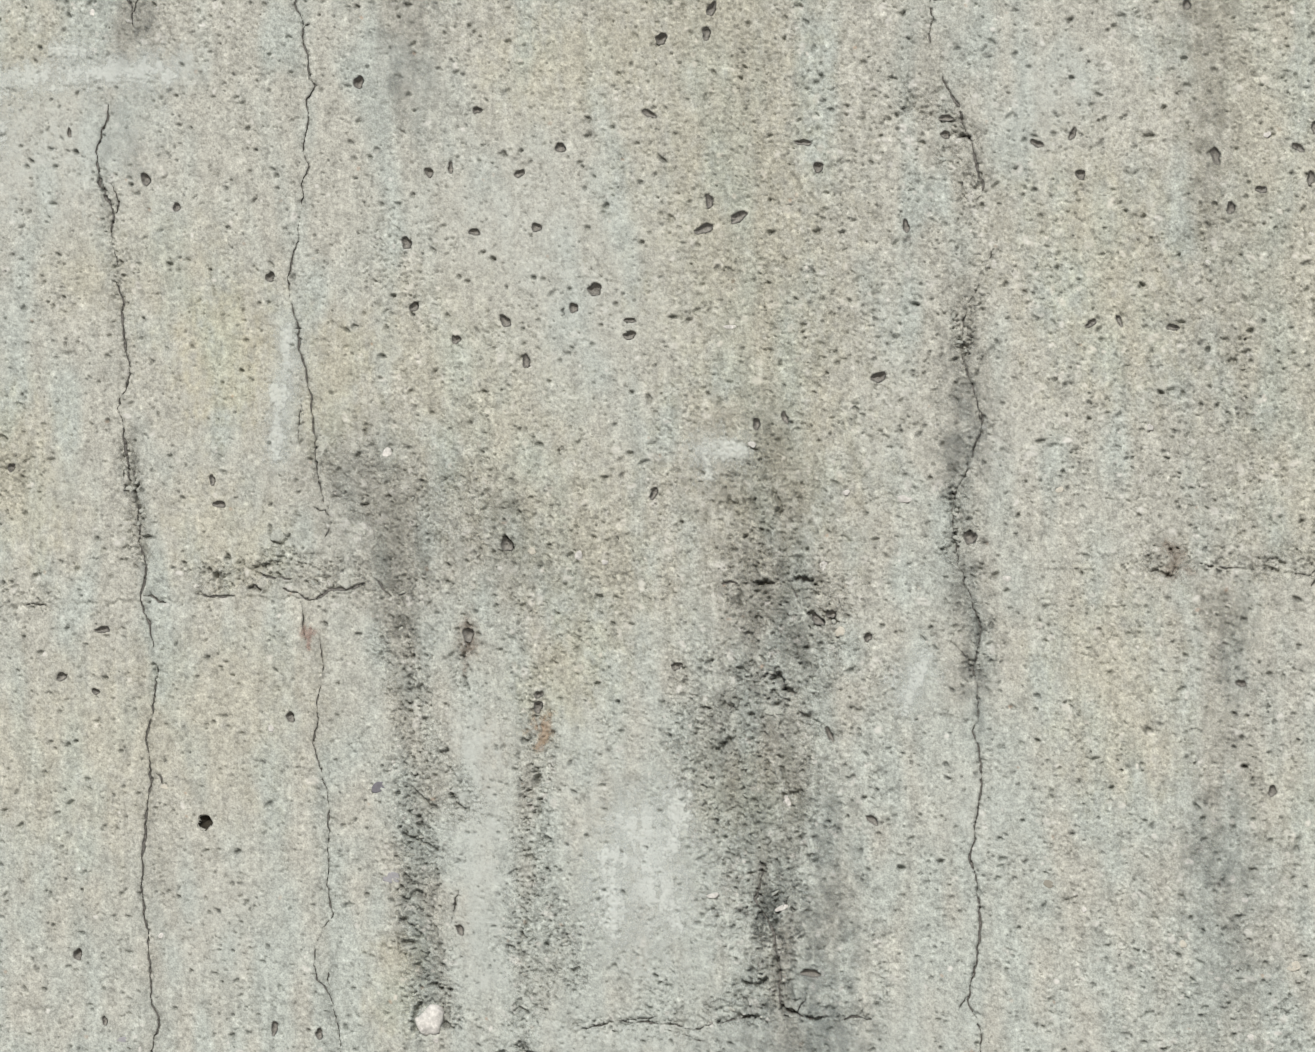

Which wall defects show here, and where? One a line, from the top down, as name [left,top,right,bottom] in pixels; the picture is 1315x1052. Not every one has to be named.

crack [95,105,166,1052]
crack [199,572,386,1050]
crack [287,0,332,536]
damp [682,421,756,480]
crack [586,861,870,1041]
crack [942,77,984,197]
crack [950,288,983,1052]